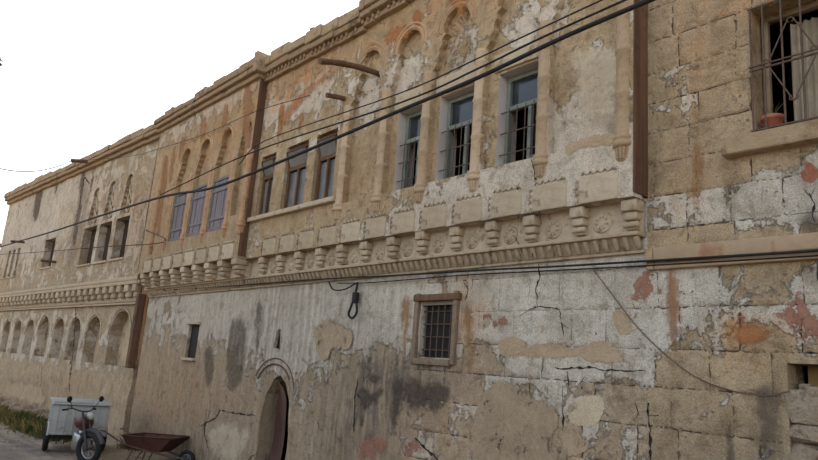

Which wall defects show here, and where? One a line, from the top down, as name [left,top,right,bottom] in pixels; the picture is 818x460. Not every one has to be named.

spalling [800,162,818,183]
crack [515,210,568,335]
peeling [776,292,818,348]
crack [555,366,645,430]
crack [415,438,438,460]